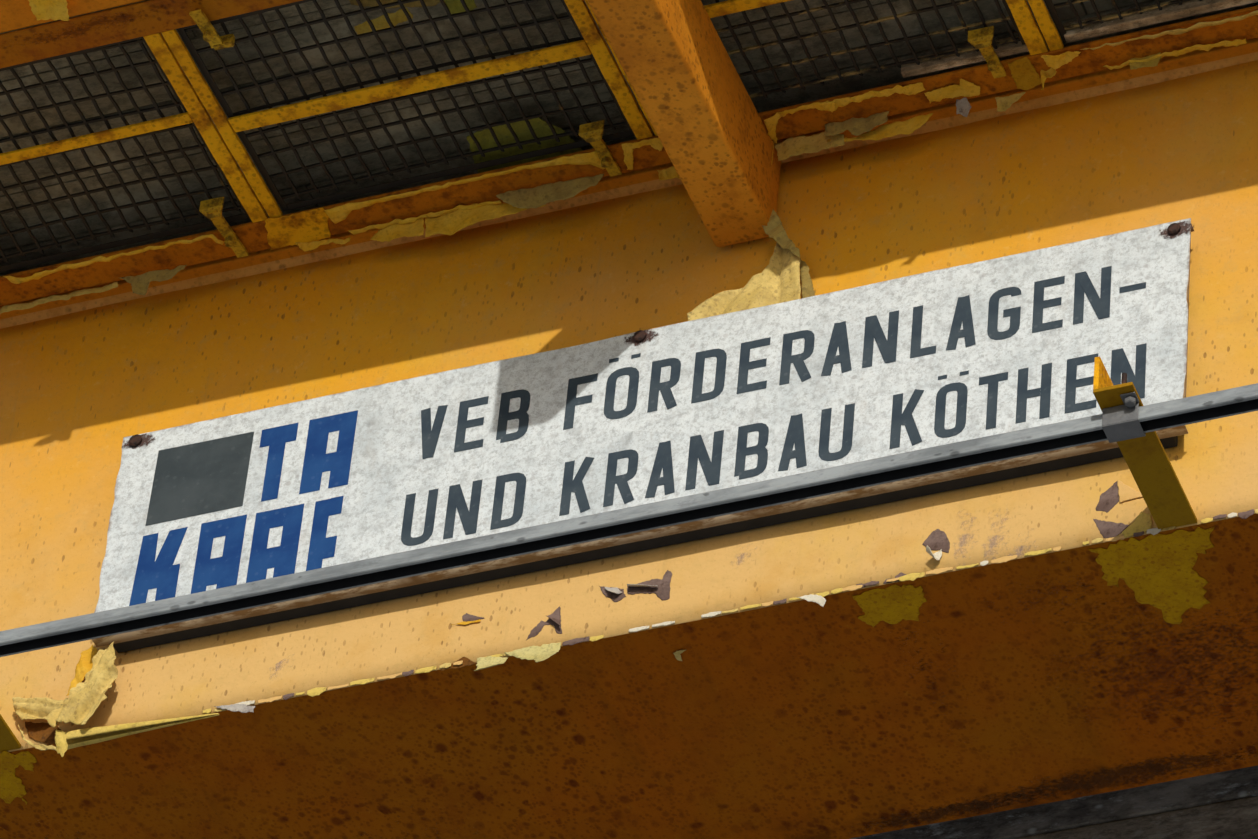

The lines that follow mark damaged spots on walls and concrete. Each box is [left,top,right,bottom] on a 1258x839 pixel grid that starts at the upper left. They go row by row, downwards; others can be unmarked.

peeling [775,111,933,161]
peeling [956,98,972,117]
peeling [370,174,604,242]
peeling [0,265,187,314]
peeling [687,209,815,321]
peeling [1082,480,1175,546]
peeling [1201,509,1258,523]
peeling [600,570,672,602]
peeling [701,529,1061,618]
peeling [629,621,675,632]
peeling [12,606,604,757]
rust [867,751,1252,827]